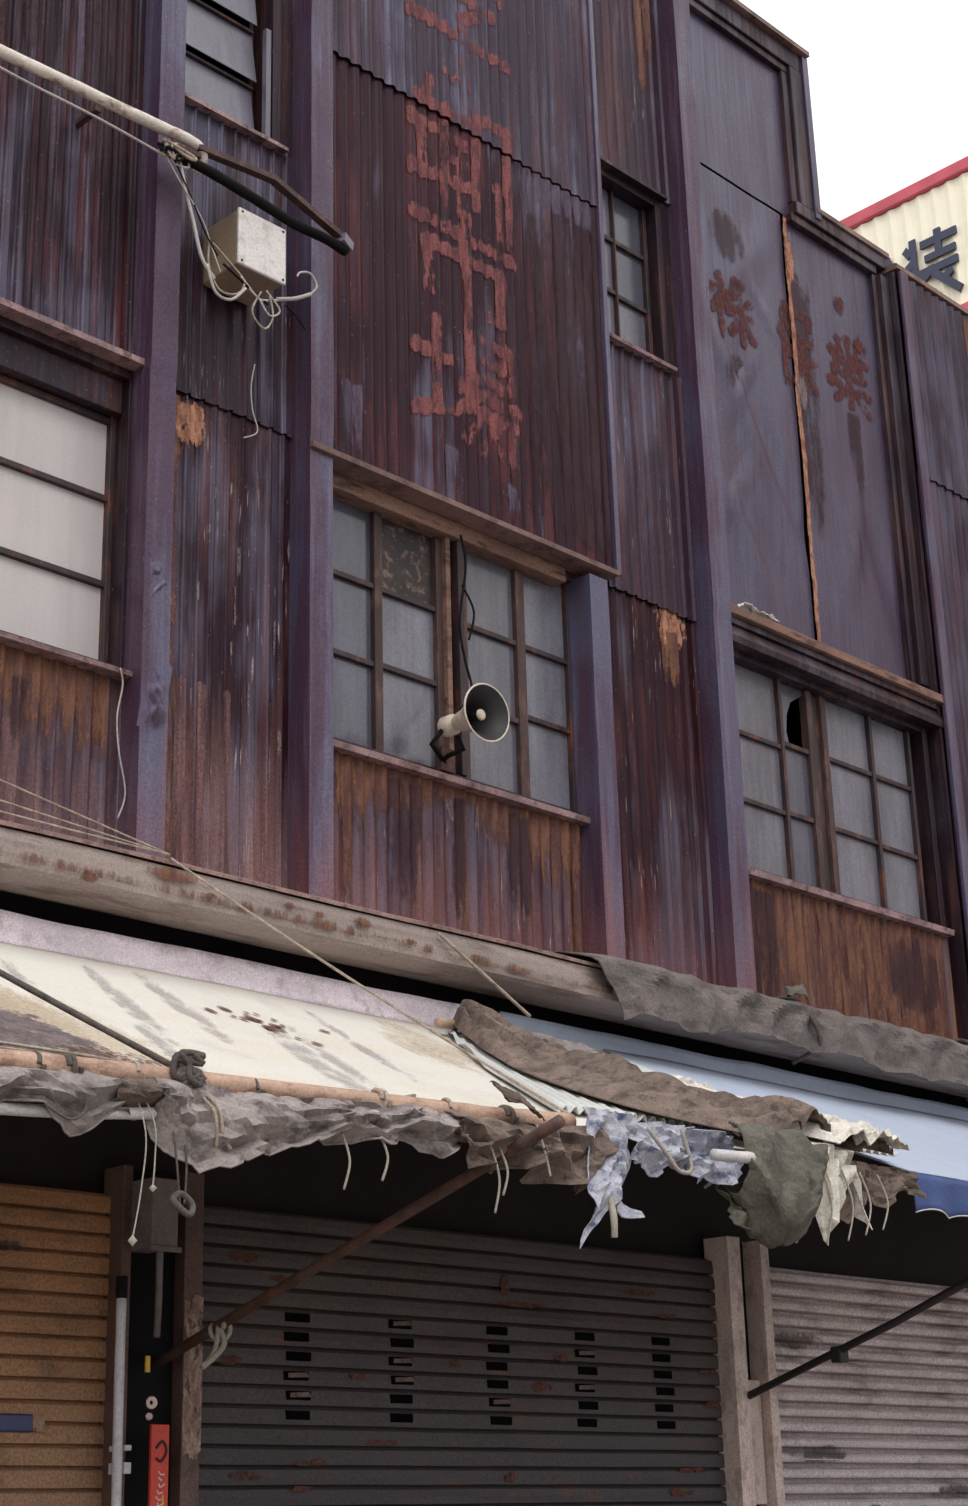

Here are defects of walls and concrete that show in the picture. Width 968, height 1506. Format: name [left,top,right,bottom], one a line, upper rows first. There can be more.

rust [81,0,133,172]
rust [0,643,108,821]
rust [147,395,370,937]
rust [654,607,687,687]
rust [23,854,132,882]
rust [334,751,582,953]
rust [471,954,528,975]
rust [749,878,952,1039]